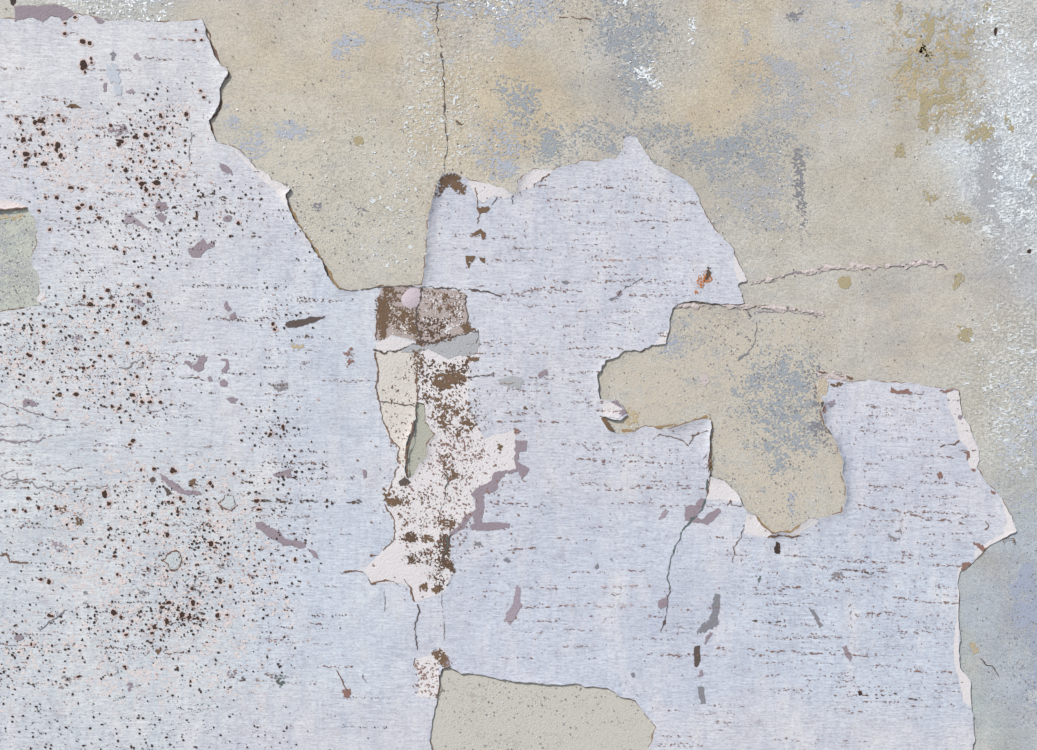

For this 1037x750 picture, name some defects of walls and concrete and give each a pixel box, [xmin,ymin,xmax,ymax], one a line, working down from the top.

crack [408,0,448,172]
rust [1022,163,1037,196]
rust [943,211,971,224]
rust [837,276,851,289]
rust [957,325,975,343]
peeling [421,548,442,564]
rust [504,380,1014,719]